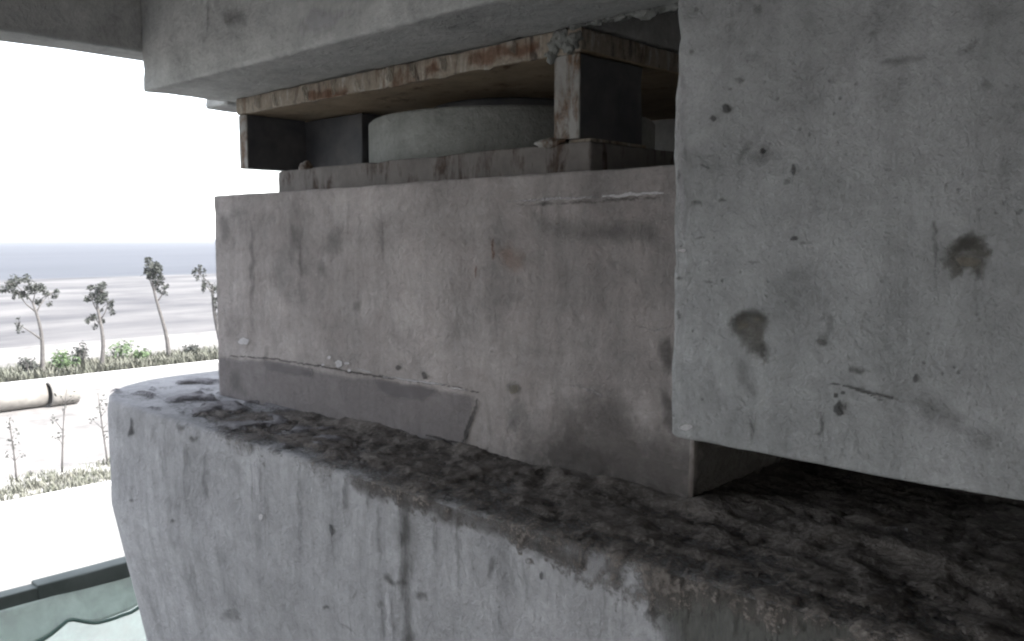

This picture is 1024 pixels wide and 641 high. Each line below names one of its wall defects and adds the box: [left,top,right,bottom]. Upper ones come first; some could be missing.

damp [529,409,784,497]